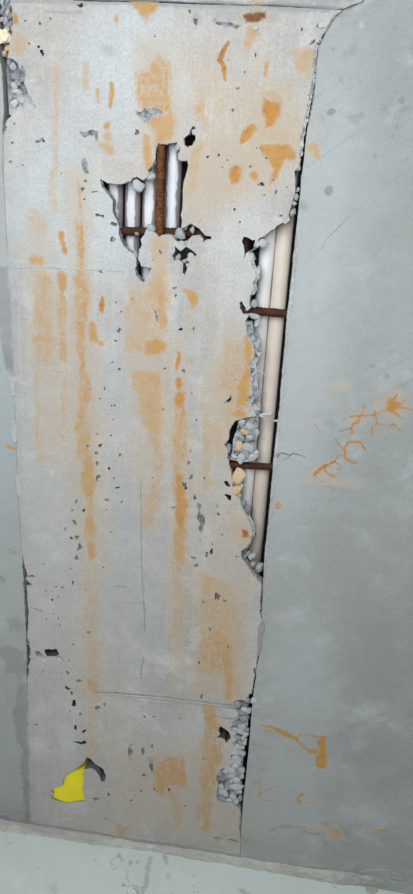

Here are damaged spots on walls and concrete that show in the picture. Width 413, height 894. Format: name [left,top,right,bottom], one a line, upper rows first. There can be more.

spalling [0,0,36,116]
corrosion [137,56,174,169]
corrosion [186,40,320,218]
corrosion [243,0,266,45]
spalling [100,126,211,282]
corrosion [125,236,168,355]
corrosion [29,182,104,748]
corrosion [132,352,188,643]
corrosion [220,336,253,427]
spalling [229,235,298,582]
corrosion [310,394,413,485]
corrosion [257,708,327,769]